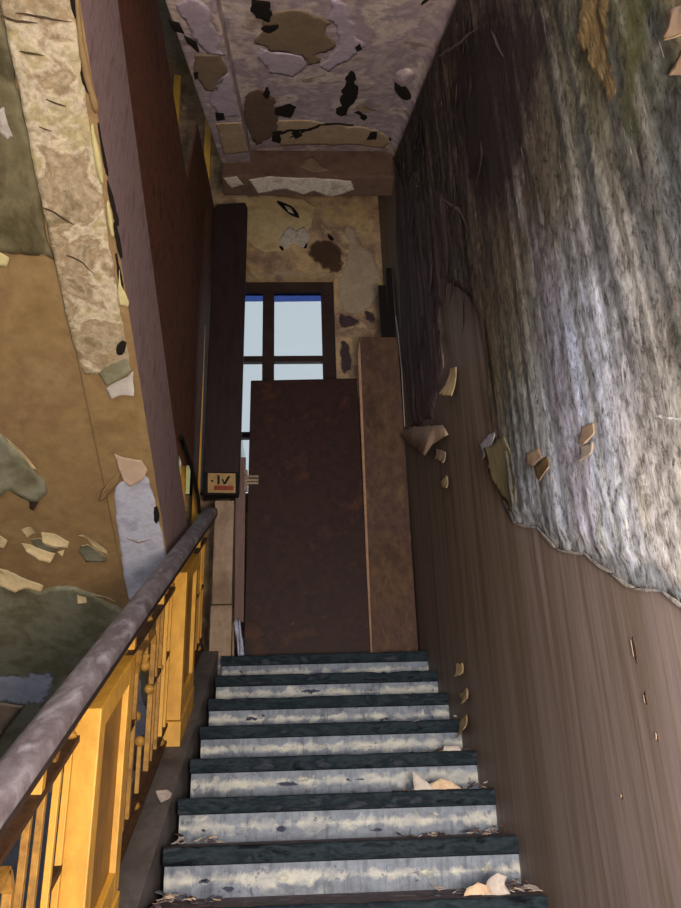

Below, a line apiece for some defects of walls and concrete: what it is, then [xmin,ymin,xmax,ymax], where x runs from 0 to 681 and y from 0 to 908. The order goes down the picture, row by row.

leakage [451,3,550,208]
peeling [0,0,135,399]
leakage [309,227,379,328]
peeling [250,0,681,607]
leakage [340,341,352,373]
peeling [0,433,47,511]
peeling [21,527,69,563]
peeling [78,534,108,562]
peeling [100,453,166,601]
peeling [0,568,122,759]
peeling [413,772,461,790]
peeling [443,714,468,751]